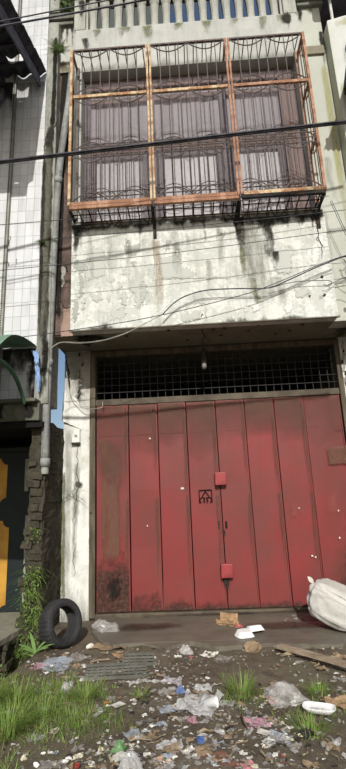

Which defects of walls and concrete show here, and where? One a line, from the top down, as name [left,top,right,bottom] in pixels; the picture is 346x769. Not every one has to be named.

leakage [279,9,302,23]
leakage [0,28,323,418]
peeling [60,237,148,399]